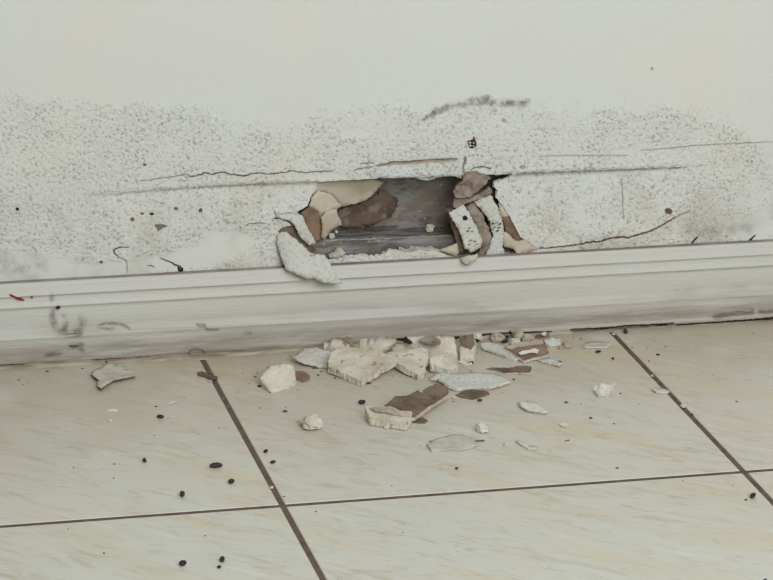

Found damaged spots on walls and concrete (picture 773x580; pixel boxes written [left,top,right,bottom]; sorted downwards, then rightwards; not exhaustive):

crack [141,170,334,181]
spalling [275,165,538,284]
peeling [360,158,459,166]
crack [520,141,773,249]